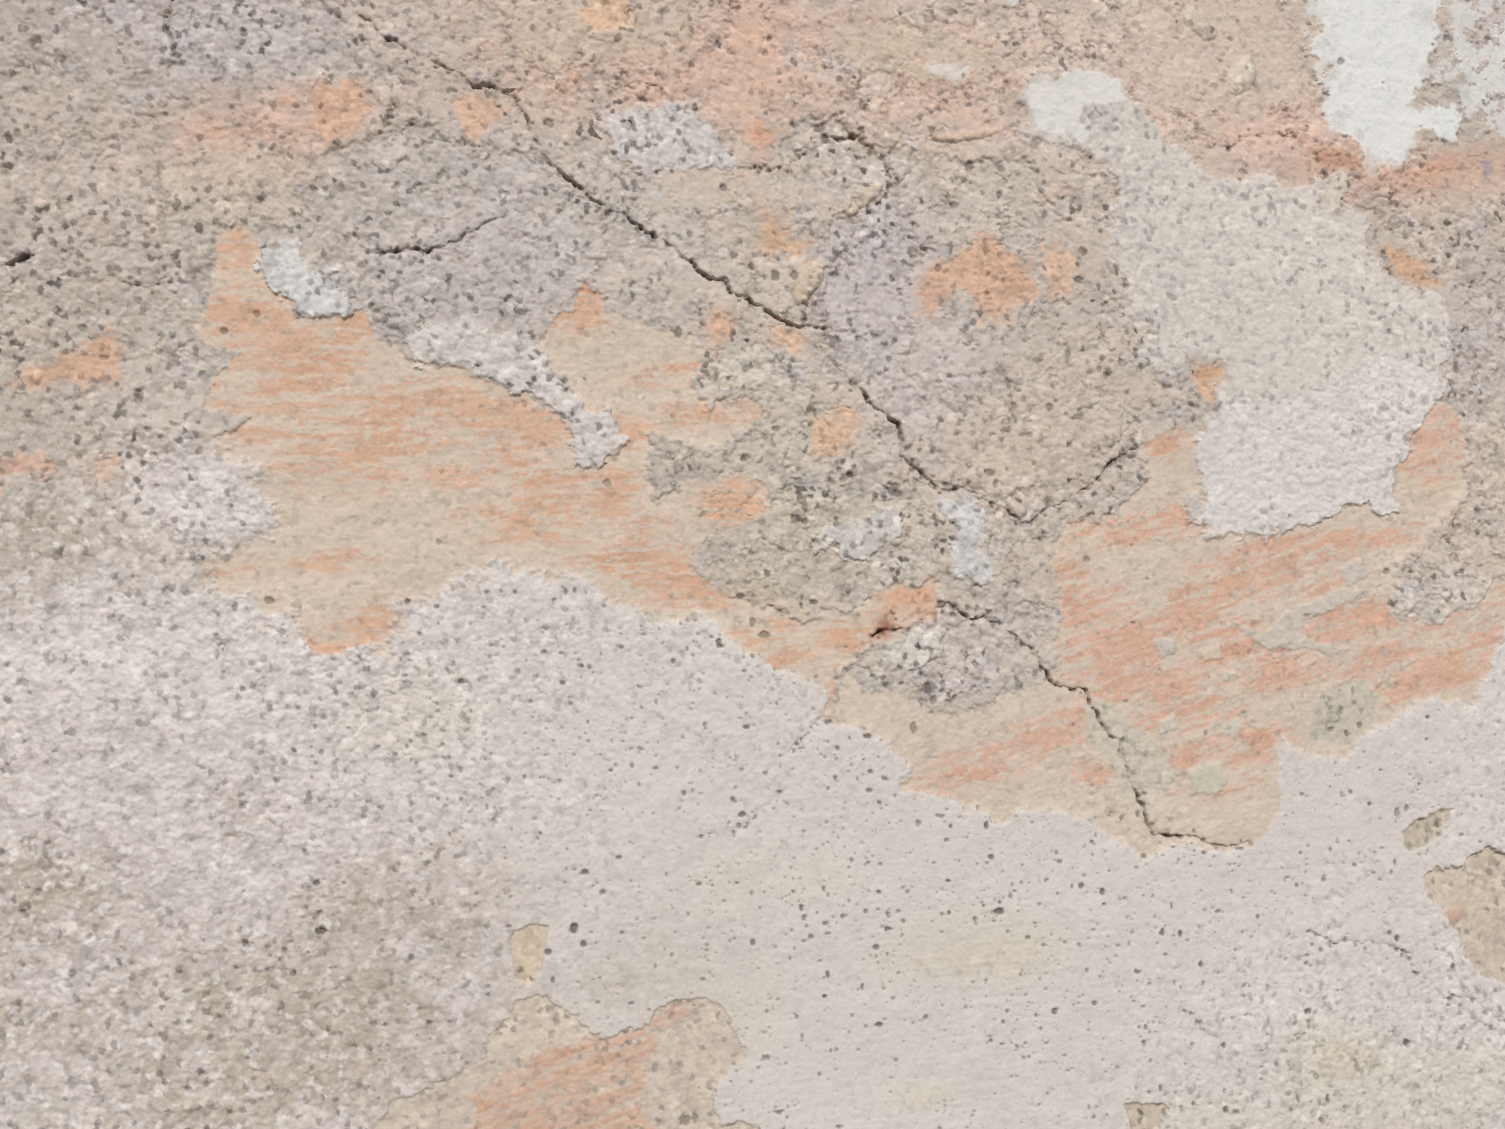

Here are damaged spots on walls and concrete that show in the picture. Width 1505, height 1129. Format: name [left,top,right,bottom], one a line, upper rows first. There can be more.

peeling [927,63,971,82]
crack [332,0,845,338]
crack [739,128,896,206]
crack [0,251,182,291]
crack [892,235,938,304]
crack [1040,296,1113,309]
peeling [199,67,1505,860]
crack [847,378,1147,539]
crack [695,601,1250,852]
peeling [1423,846,1505,984]
peeling [374,925,761,1129]